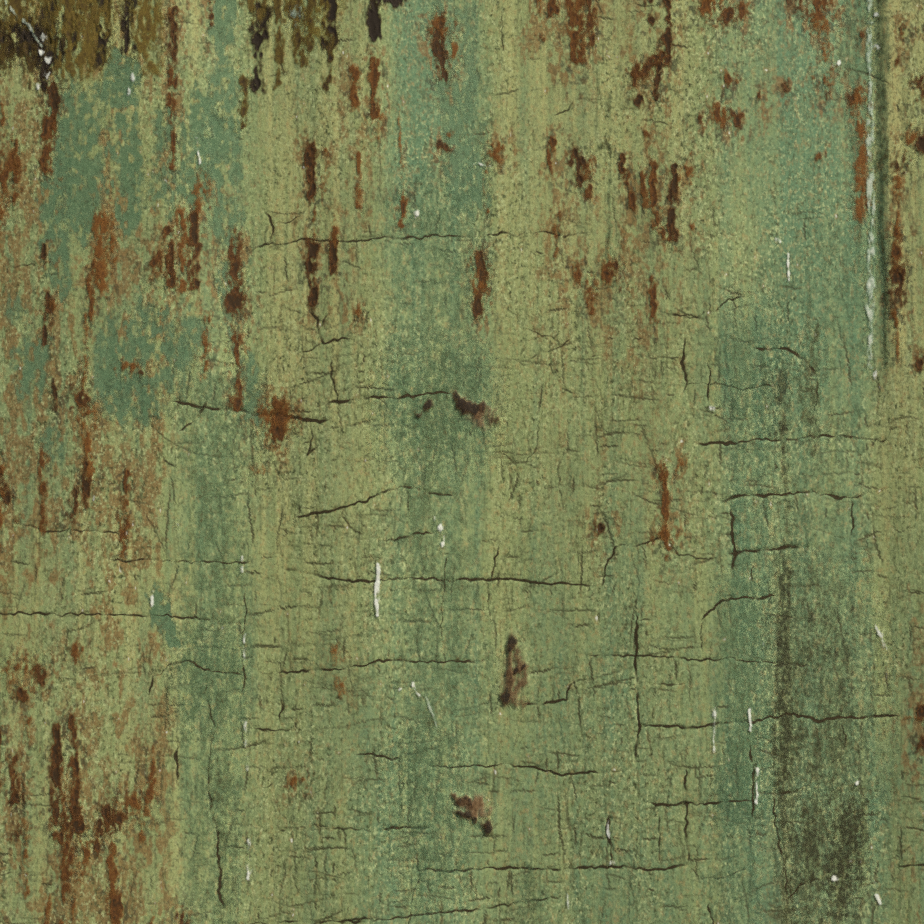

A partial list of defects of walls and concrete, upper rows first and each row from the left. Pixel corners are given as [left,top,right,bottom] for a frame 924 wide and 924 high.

rust [429,11,458,82]
rust [149,175,211,293]
rust [224,229,247,316]
crack [235,212,457,248]
rust [619,153,693,242]
rust [887,211,907,359]
crack [270,311,449,454]
crack [700,434,854,446]
crack [0,611,209,620]
crack [281,486,896,757]
rust [44,712,156,924]
crack [317,748,832,924]